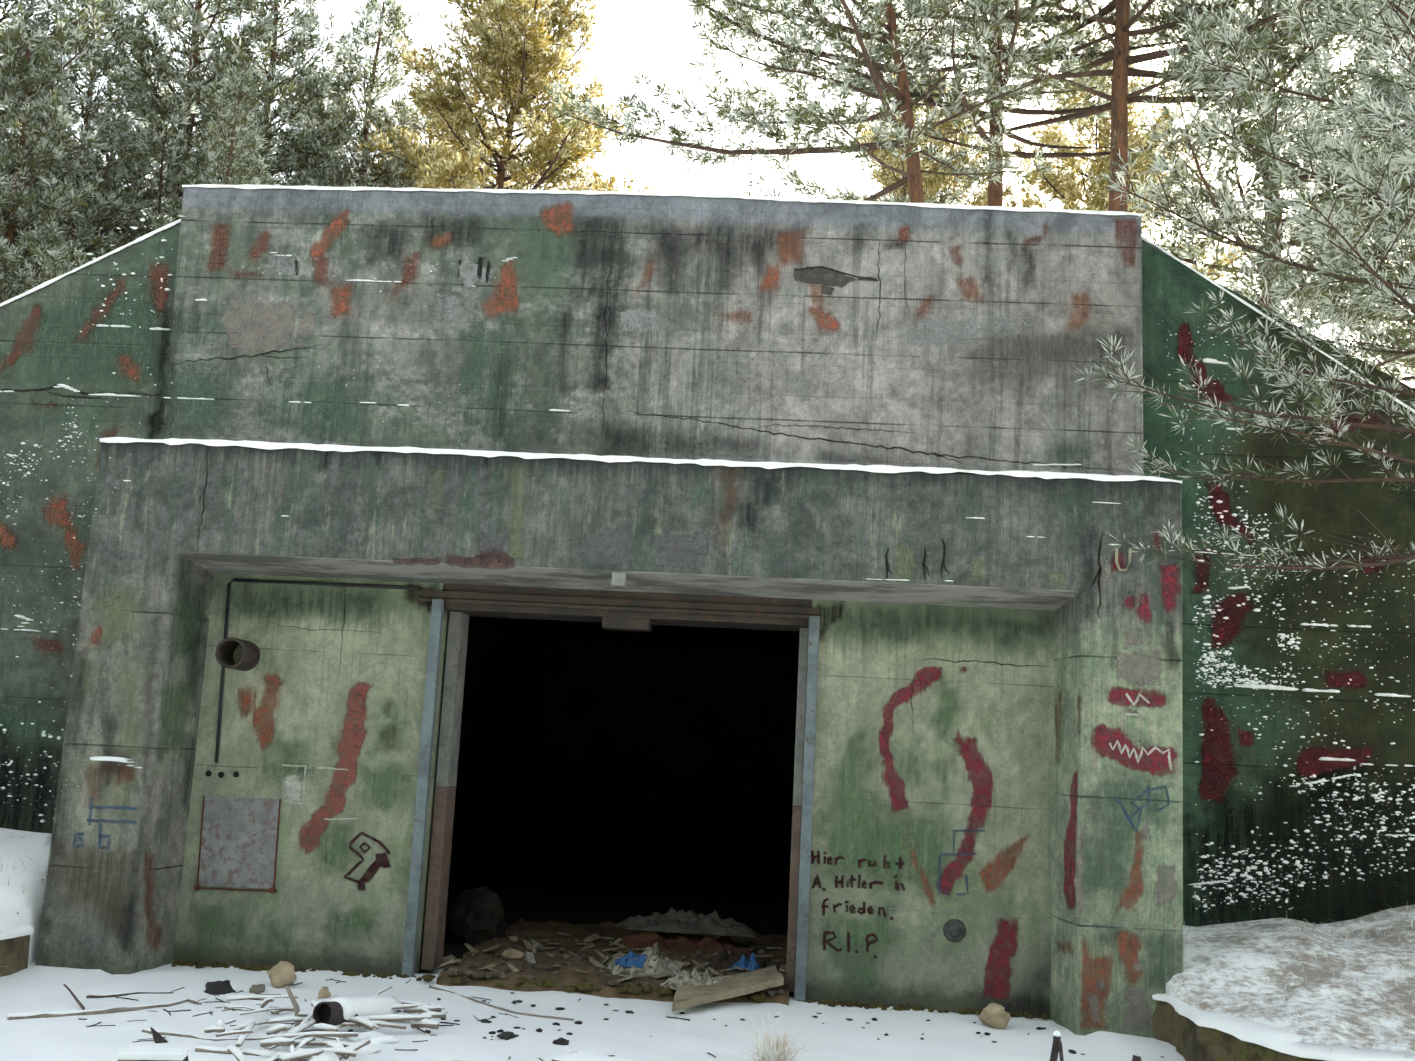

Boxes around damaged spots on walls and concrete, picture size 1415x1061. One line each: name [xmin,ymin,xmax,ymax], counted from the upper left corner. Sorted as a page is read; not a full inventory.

crack [0,344,321,399]
damp [579,220,625,385]
damp [656,229,789,290]
crack [601,218,1124,472]